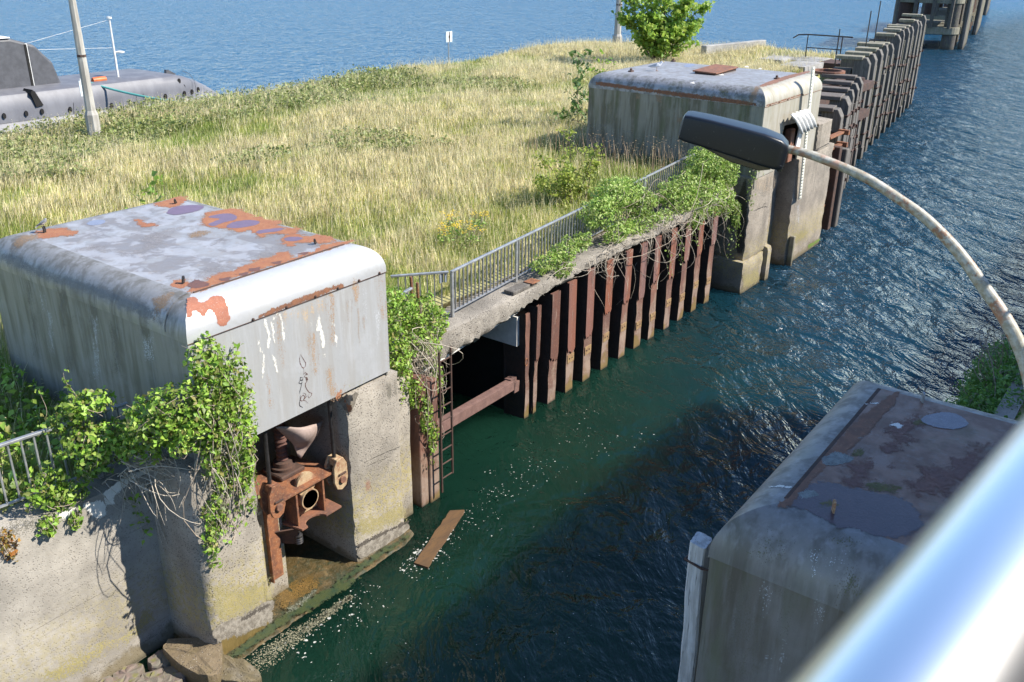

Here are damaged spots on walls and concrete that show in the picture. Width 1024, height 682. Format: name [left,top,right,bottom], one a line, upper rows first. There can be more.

corrosion [11,227,77,250]
peeling [166,205,204,215]
corrosion [151,208,357,322]
corrosion [258,279,360,402]
corrosion [777,391,941,508]
corrosion [903,441,997,501]